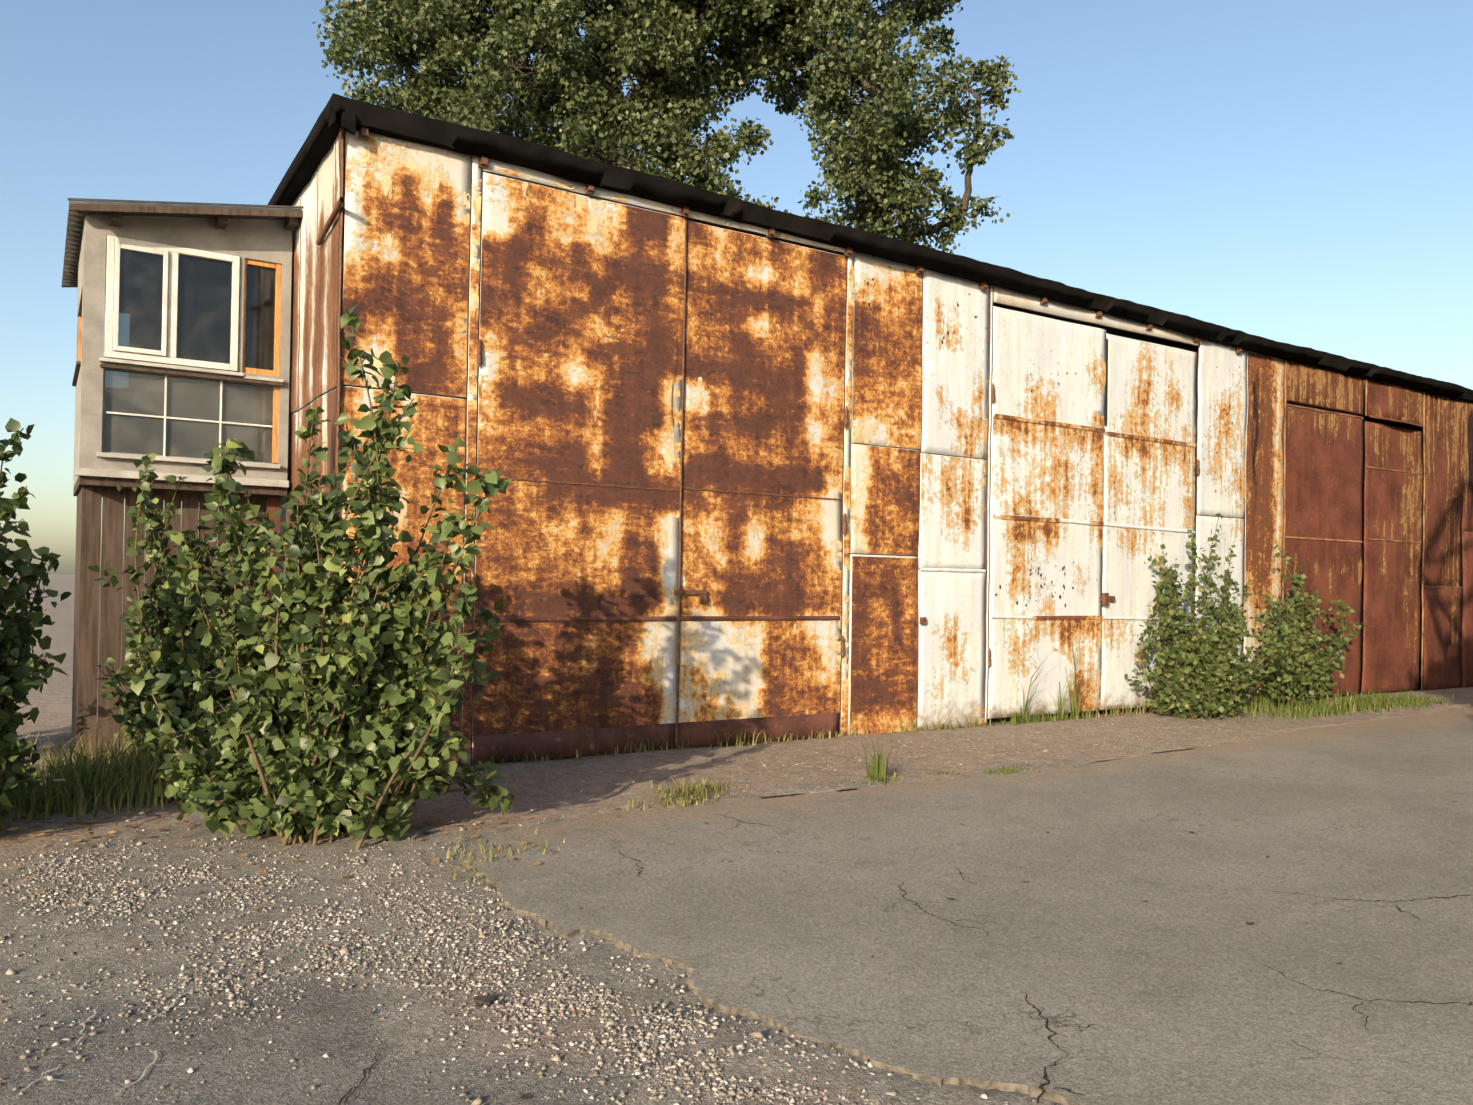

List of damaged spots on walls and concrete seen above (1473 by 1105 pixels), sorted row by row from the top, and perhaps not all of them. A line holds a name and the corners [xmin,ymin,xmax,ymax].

rust [285,135,1473,766]
crack [885,868,1004,939]
crack [1244,888,1466,920]
crack [1254,959,1473,1031]
crack [339,1045,384,1105]
crack [1020,990,1111,1104]